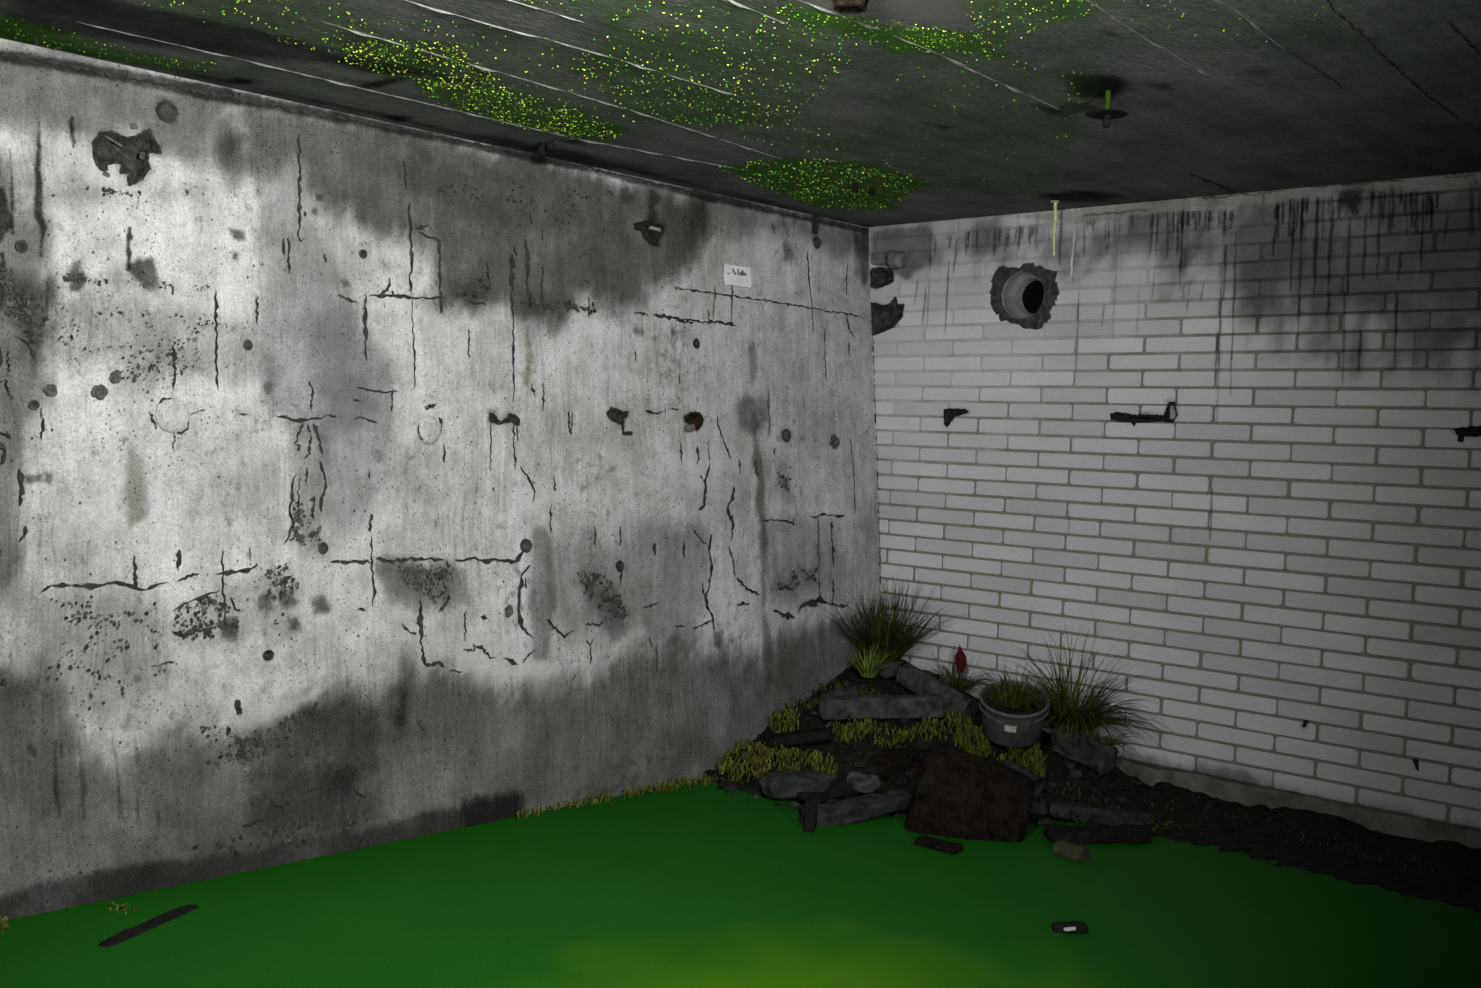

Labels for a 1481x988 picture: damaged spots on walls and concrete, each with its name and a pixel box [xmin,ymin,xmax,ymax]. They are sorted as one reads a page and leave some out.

spalling [49,123,162,197]
crack [283,134,327,274]
leakage [0,0,928,326]
spalling [870,267,905,336]
leakage [1116,182,1481,348]
crack [0,337,45,554]
crack [40,161,604,681]
spalling [607,407,633,436]
spalling [684,411,704,432]
crack [594,252,881,672]
leakage [315,597,330,612]
leakage [0,618,901,920]